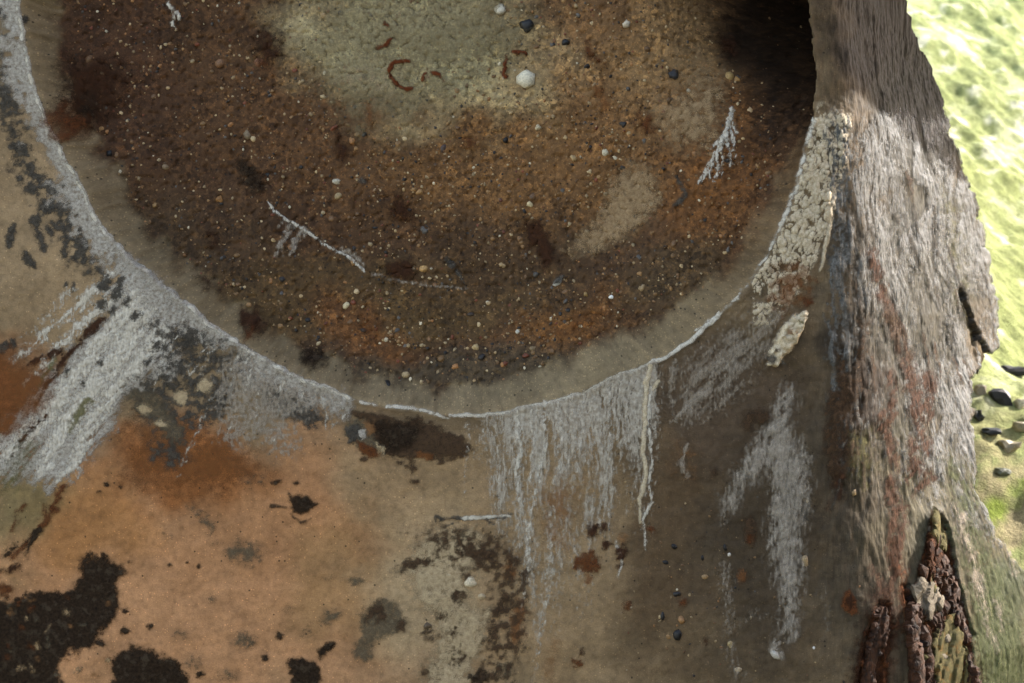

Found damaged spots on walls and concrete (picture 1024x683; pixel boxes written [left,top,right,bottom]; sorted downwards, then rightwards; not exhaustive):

corrosion [0,316,106,458]
corrosion [129,415,253,493]
damp [0,0,722,641]
crack [267,201,467,288]
crack [672,175,688,207]
damp [725,391,809,658]
damp [668,104,1012,567]
spalling [841,506,982,683]
crack [846,148,989,409]